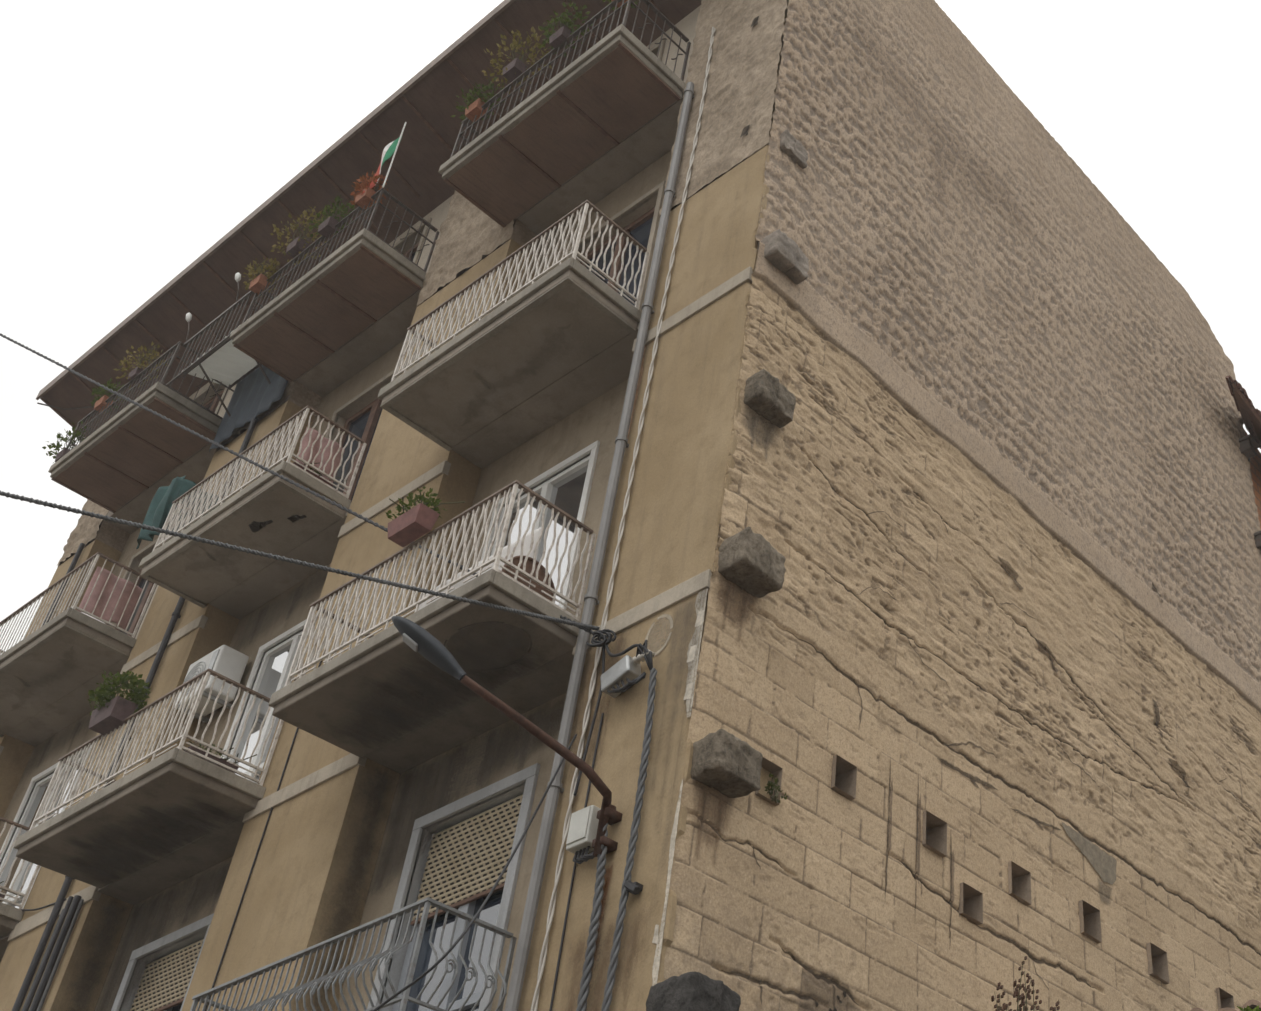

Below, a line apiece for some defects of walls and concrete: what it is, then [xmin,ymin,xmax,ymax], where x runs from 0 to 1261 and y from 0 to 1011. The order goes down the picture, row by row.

crack [810,460,923,572]
crack [796,485,1186,807]
crack [696,816,785,871]
leakage [885,757,893,894]
crack [756,613,1261,956]
crack [722,944,858,1008]
crack [898,859,1095,991]